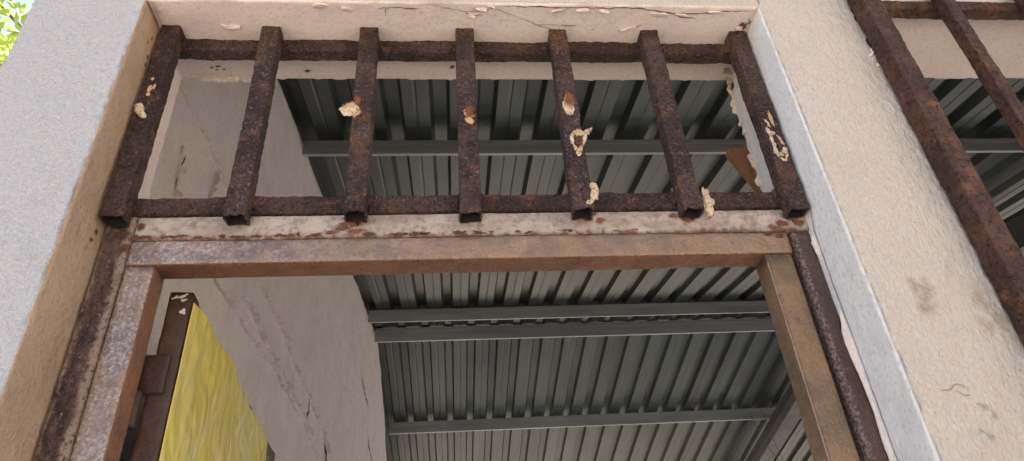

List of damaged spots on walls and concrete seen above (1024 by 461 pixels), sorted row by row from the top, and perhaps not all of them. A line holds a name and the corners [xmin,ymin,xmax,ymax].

crack [380,0,759,31]
corrosion [115,218,375,252]
corrosion [764,214,804,237]